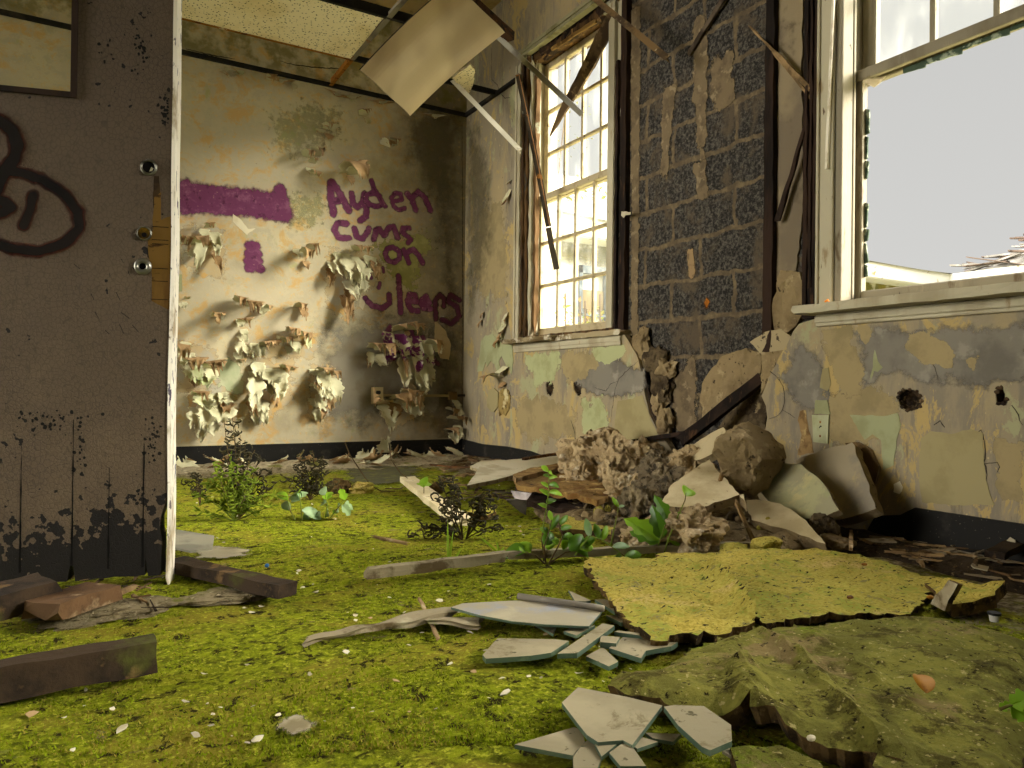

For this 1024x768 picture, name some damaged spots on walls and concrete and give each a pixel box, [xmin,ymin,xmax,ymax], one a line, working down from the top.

peeling [179,214,255,280]
peeling [176,295,345,443]
peeling [292,243,388,324]
peeling [366,321,451,434]
peeling [444,400,468,444]
peeling [471,180,658,440]
spalling [798,410,814,455]
peeling [820,325,924,470]
peeling [905,327,979,371]
spalling [994,385,1009,406]